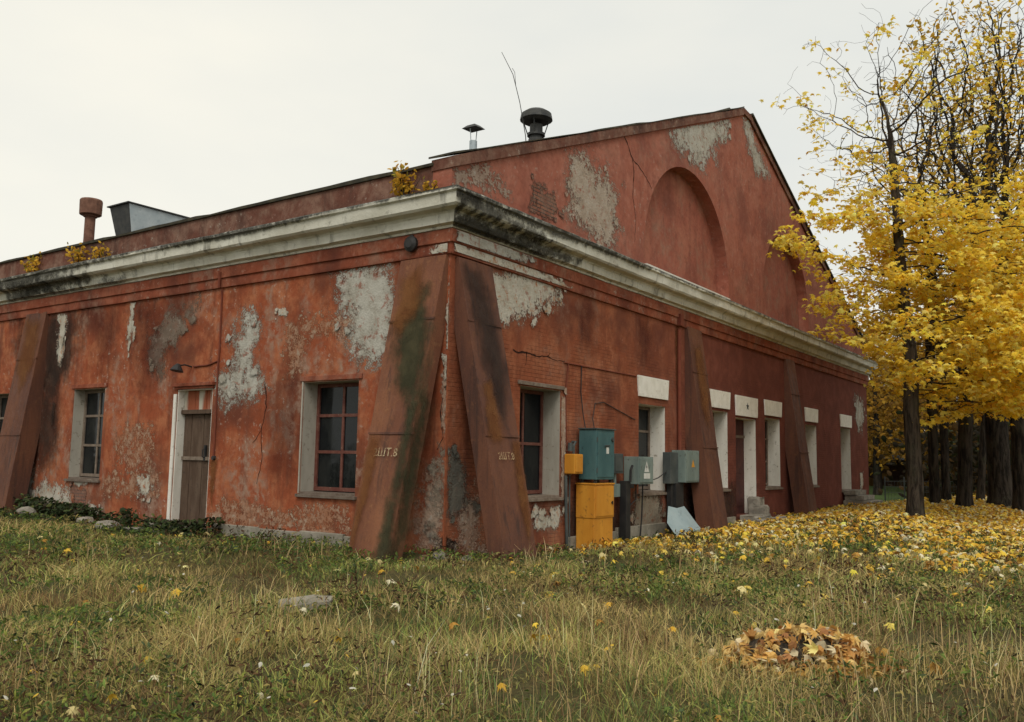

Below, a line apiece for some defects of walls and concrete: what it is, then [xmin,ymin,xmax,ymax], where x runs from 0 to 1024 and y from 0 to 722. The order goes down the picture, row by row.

peeling [528,146,625,251]
crack [624,136,652,231]
peeling [669,119,732,173]
peeling [146,292,201,382]
peeling [213,304,271,414]
peeling [331,263,395,372]
peeling [429,230,573,328]
crack [513,349,564,365]
crack [254,383,267,484]
leakage [413,469,443,551]
peeling [531,388,572,534]